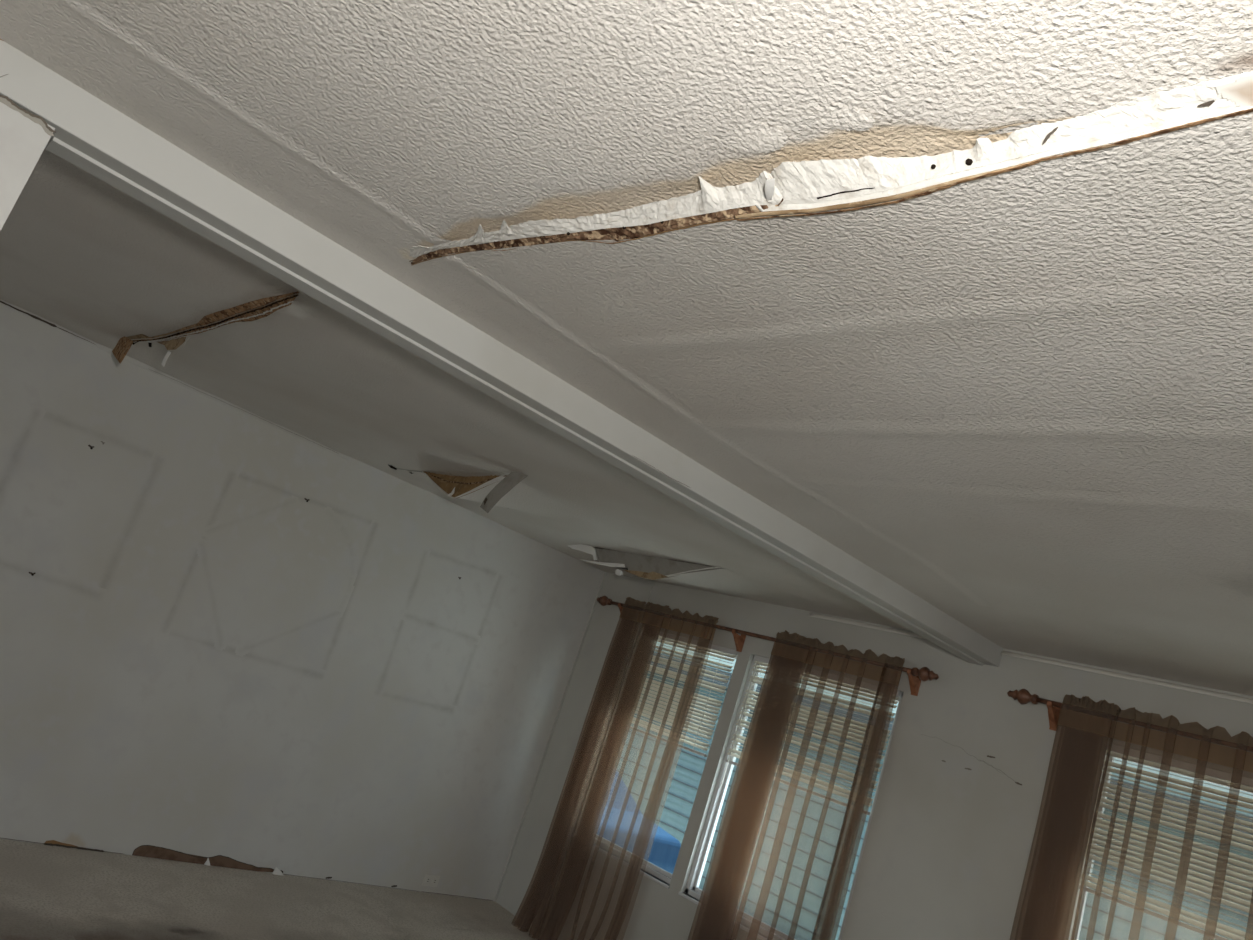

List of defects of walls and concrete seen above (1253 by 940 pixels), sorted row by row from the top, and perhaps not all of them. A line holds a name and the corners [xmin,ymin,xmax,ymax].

crack [0,74,56,136]
peeling [568,544,626,568]
flaking render [44,831,104,852]